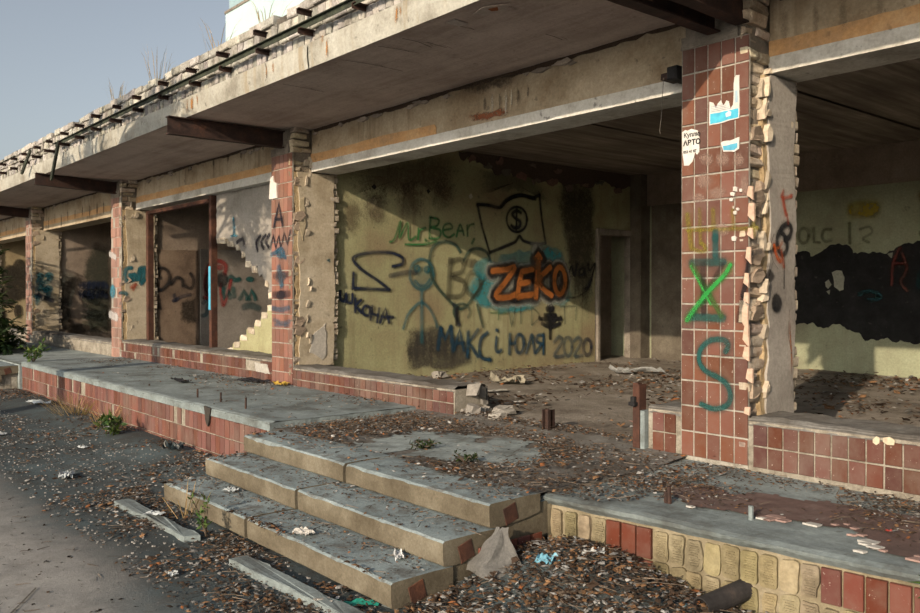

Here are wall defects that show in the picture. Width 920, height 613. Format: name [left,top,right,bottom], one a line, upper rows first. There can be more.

flaking render [119,146,262,357]
spalling [217,238,272,349]
peeling [269,176,278,199]
flaking render [288,24,680,240]
flaking render [729,0,773,416]
spalling [791,112,800,213]
peeling [825,270,844,294]
peeling [756,514,888,554]